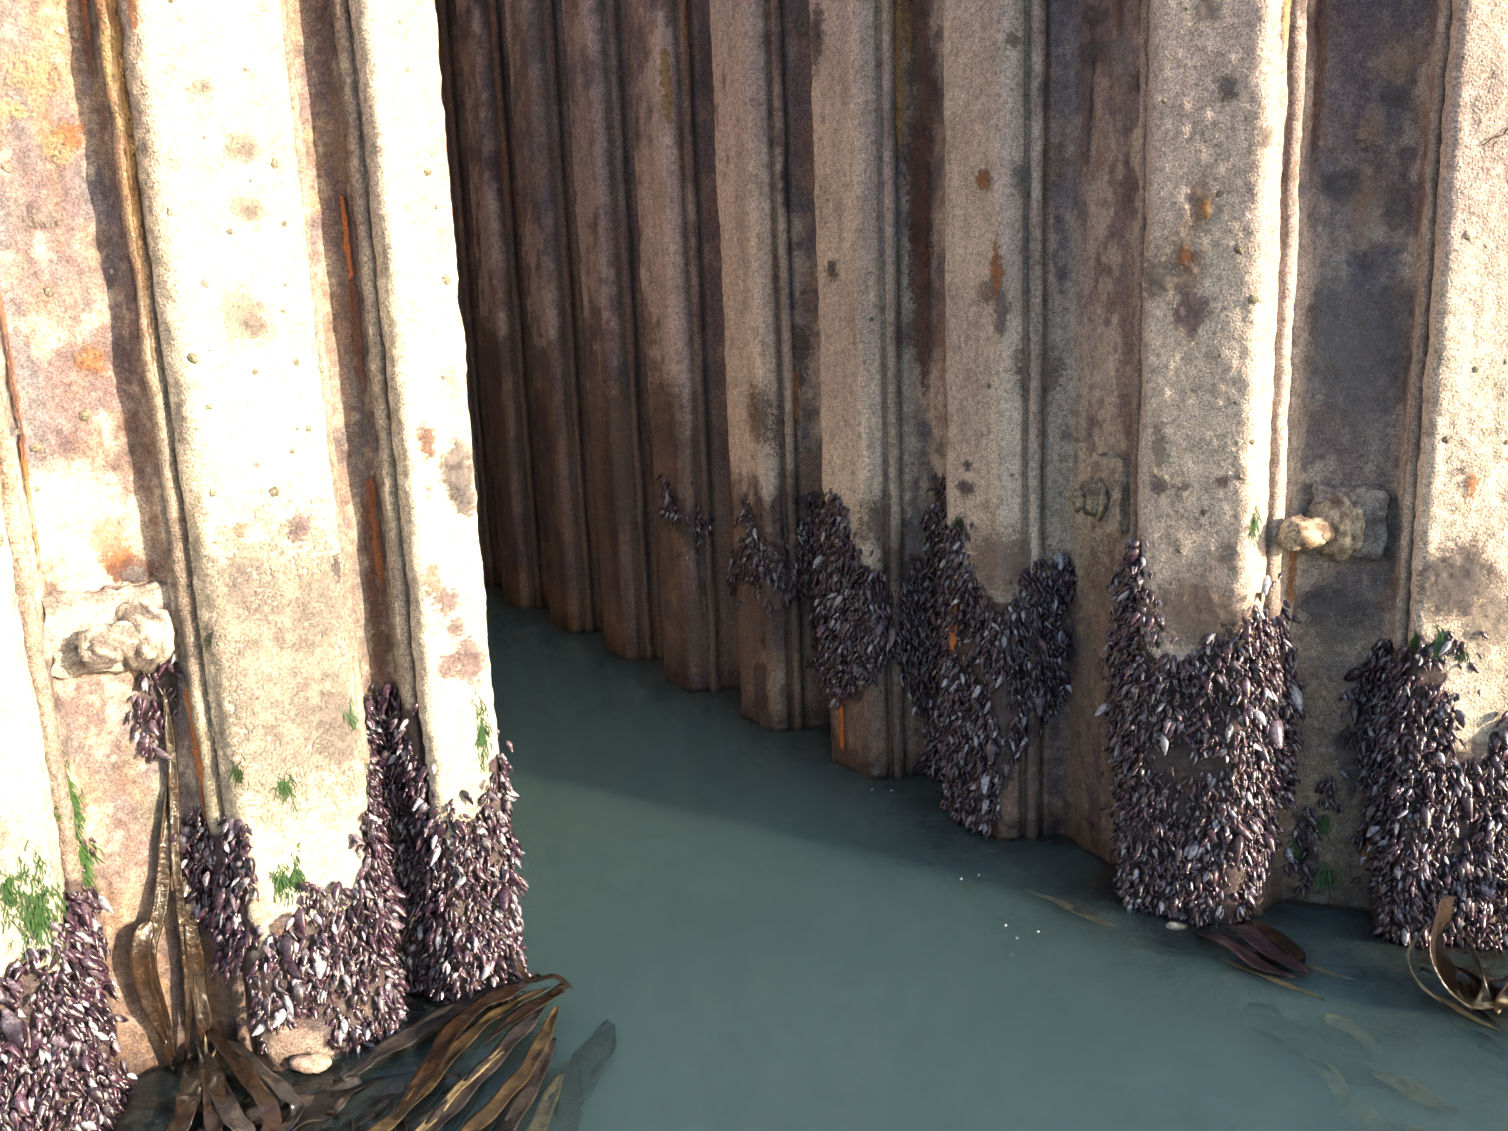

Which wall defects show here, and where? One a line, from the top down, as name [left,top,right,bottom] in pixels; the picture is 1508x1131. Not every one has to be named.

rust [1283,0,1292,57]
rust [1313,0,1330,162]
rust [75,0,159,395]
rust [894,0,936,397]
rust [975,168,991,191]
rust [340,196,366,393]
rust [978,231,1012,341]
rust [91,516,134,584]
rust [360,477,385,679]
leakage [1415,535,1508,658]
rust [183,687,209,837]